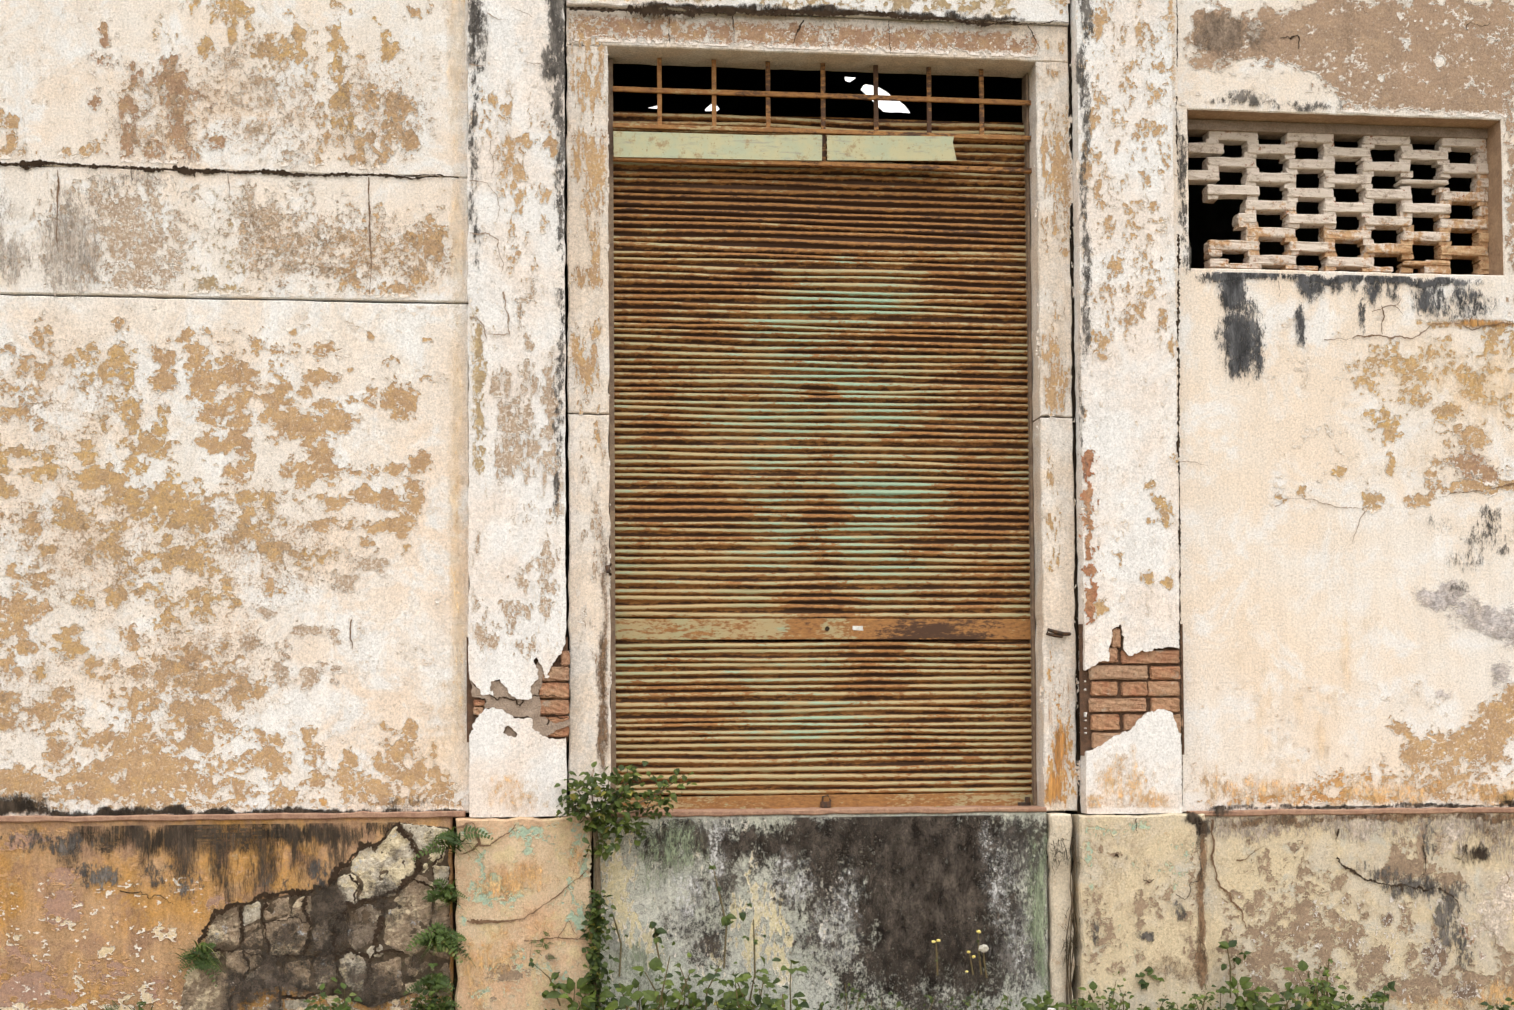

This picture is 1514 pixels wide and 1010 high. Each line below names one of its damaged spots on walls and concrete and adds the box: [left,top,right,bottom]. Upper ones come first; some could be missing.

peeling [0,0,454,170]
leakage [0,30,455,297]
flaking render [436,0,1514,742]
leakage [1177,113,1496,384]
crack [1324,300,1514,340]
peeling [0,171,465,816]
flaking render [1040,389,1205,811]
crack [1445,483,1514,497]
leakage [0,793,457,1010]
peeling [456,819,859,1010]
leakage [624,815,1050,1010]
crack [1335,829,1508,954]